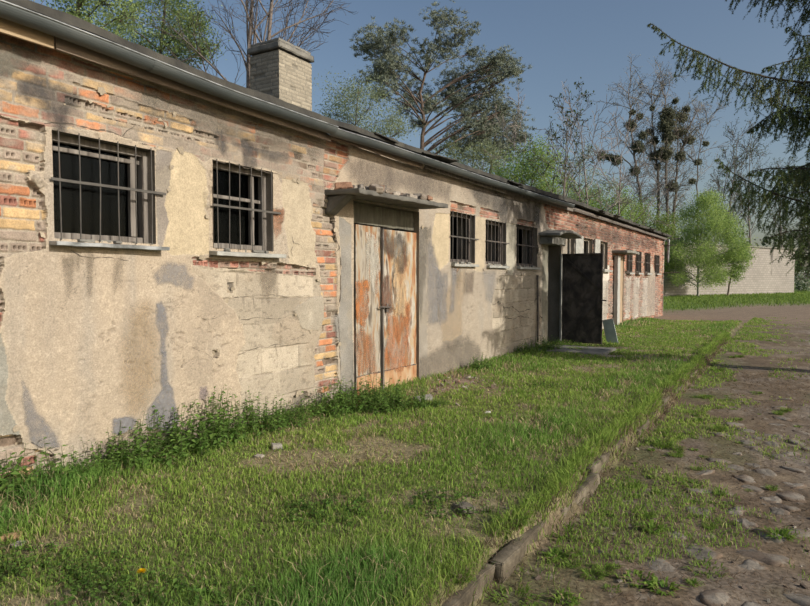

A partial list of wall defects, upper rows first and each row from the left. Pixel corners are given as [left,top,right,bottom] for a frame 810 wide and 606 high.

flaking render [0,33,433,393]
damp [92,303,185,468]
rust [356,280,375,373]
rust [385,255,412,370]
damp [419,229,480,379]
flaking render [0,434,56,489]